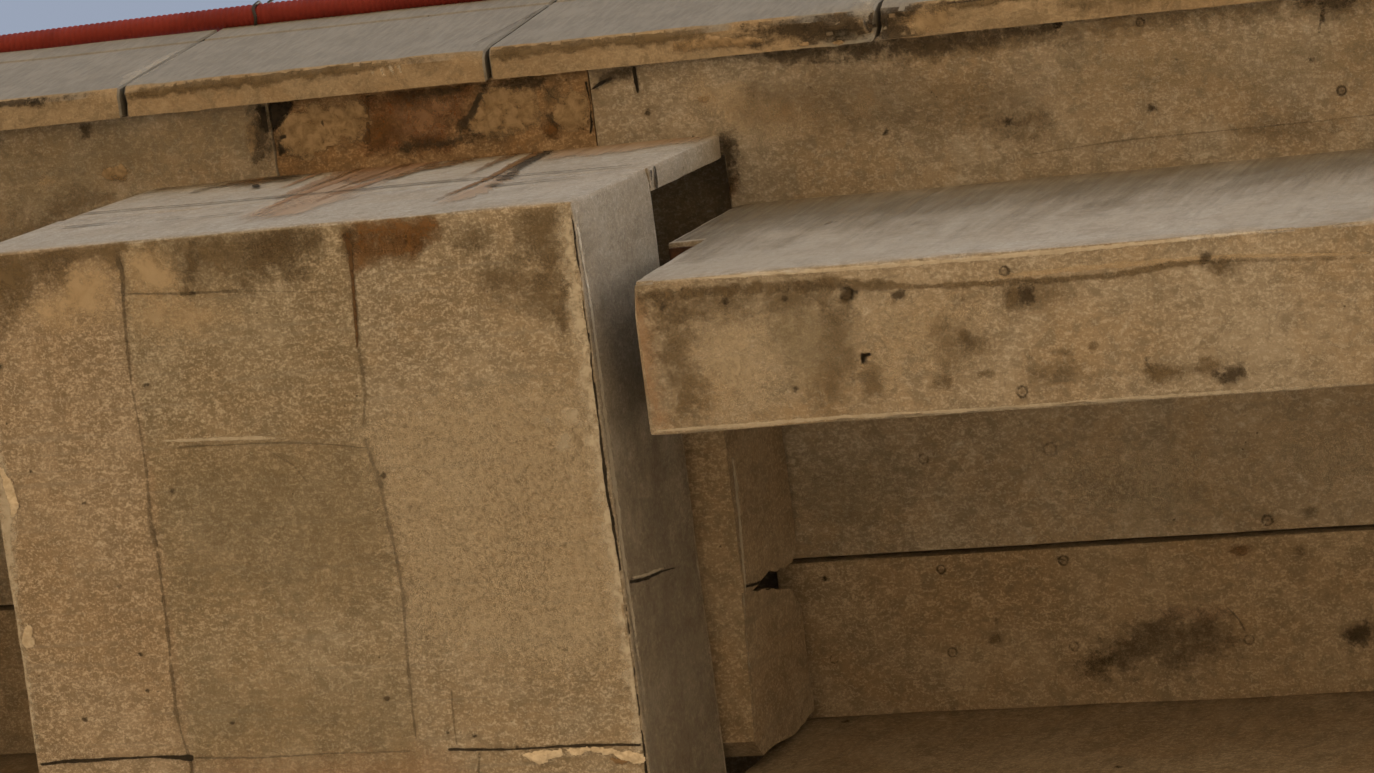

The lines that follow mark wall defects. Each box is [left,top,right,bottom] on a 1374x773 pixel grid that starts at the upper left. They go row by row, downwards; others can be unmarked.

corrosion [250,83,544,217]
crack [41,754,193,773]
crack [448,215,674,773]
spalling [522,216,646,765]